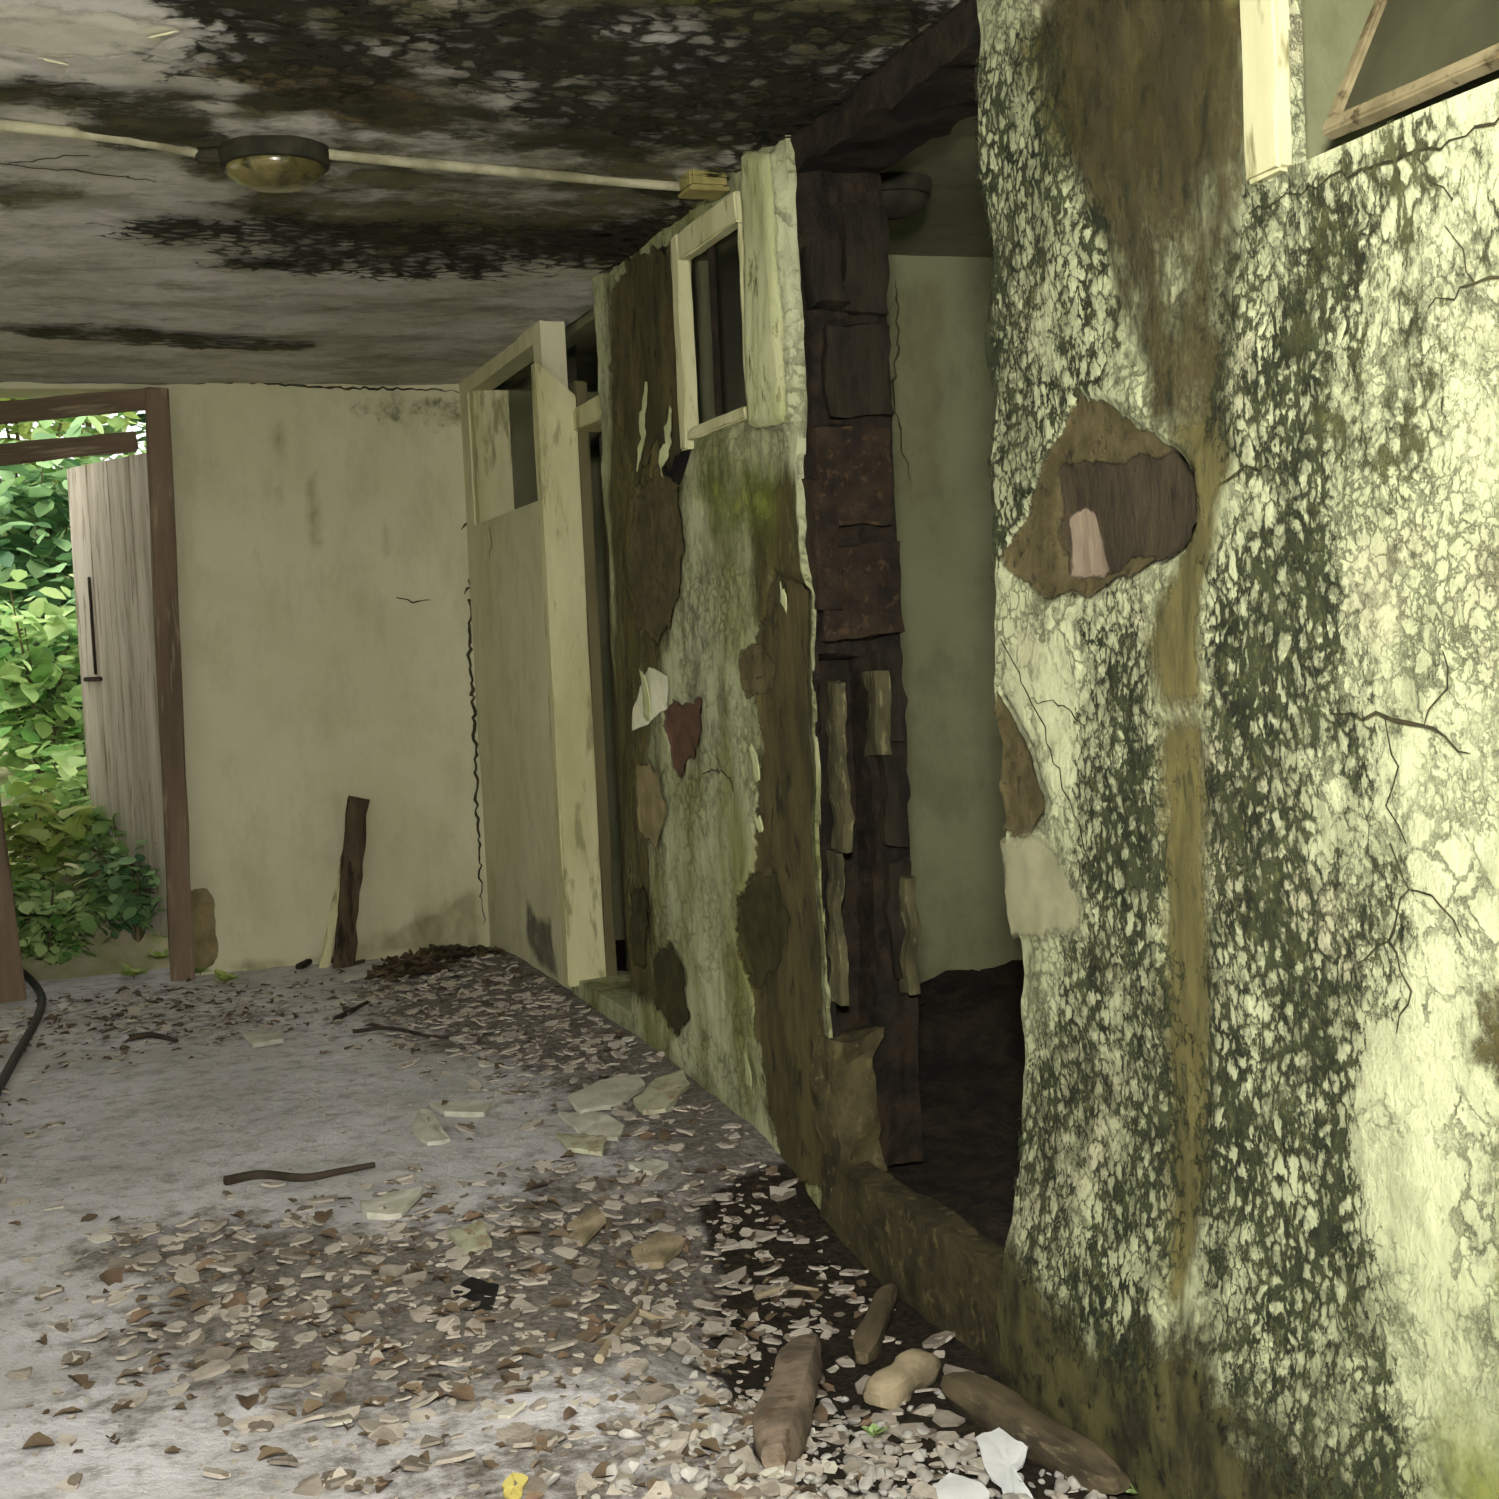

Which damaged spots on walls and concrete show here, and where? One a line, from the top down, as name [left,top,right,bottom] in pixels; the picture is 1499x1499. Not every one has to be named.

crack [1249,117,1499,308]
leakage [0,0,968,1002]
flaking render [609,242,685,647]
flaking render [1003,392,1197,600]
crack [1221,464,1275,484]
crack [461,523,492,923]
flaking render [632,667,702,849]
flaking render [994,690,1045,838]
crack [1000,639,1093,867]
leakage [974,0,1499,1499]
crack [1330,651,1471,1033]